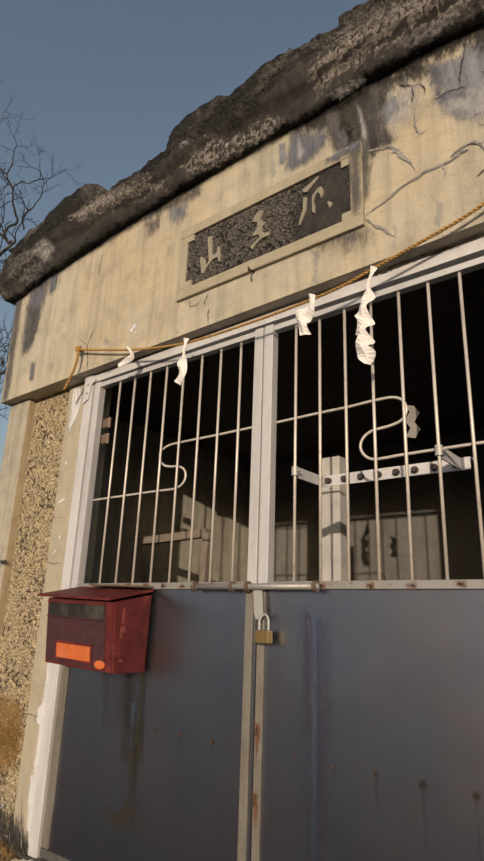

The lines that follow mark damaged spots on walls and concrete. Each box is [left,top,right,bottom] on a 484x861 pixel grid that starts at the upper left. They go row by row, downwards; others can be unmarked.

crack [397,47,465,136]
damp [2,0,484,400]
crack [365,113,484,236]
damp [0,698,23,775]
crack [1,795,32,861]